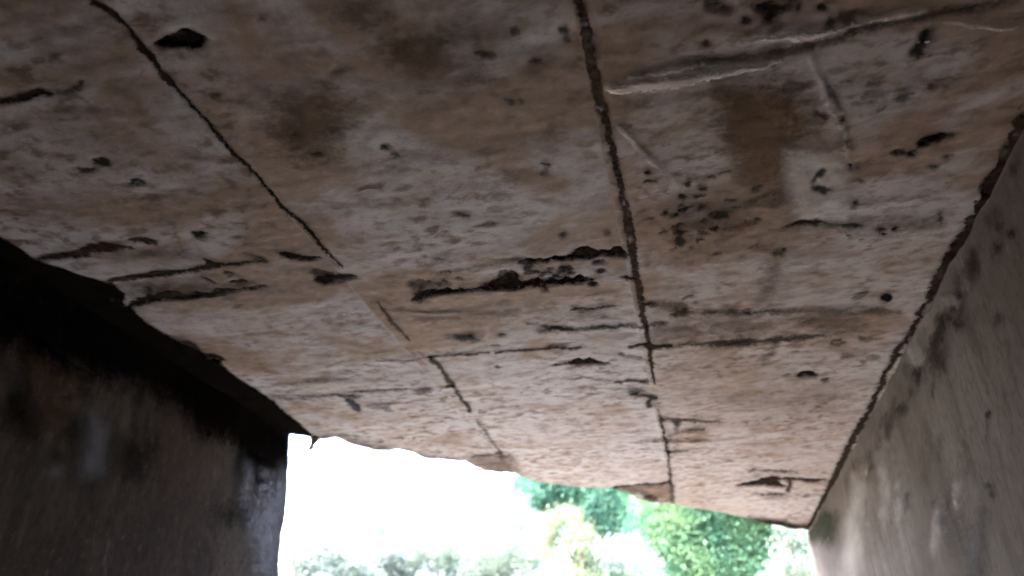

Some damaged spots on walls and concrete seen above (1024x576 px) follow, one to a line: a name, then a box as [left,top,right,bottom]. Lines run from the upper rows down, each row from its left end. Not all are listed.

spalling [154,28,206,51]
crack [37,237,156,262]
crack [109,258,267,306]
crack [616,377,649,385]